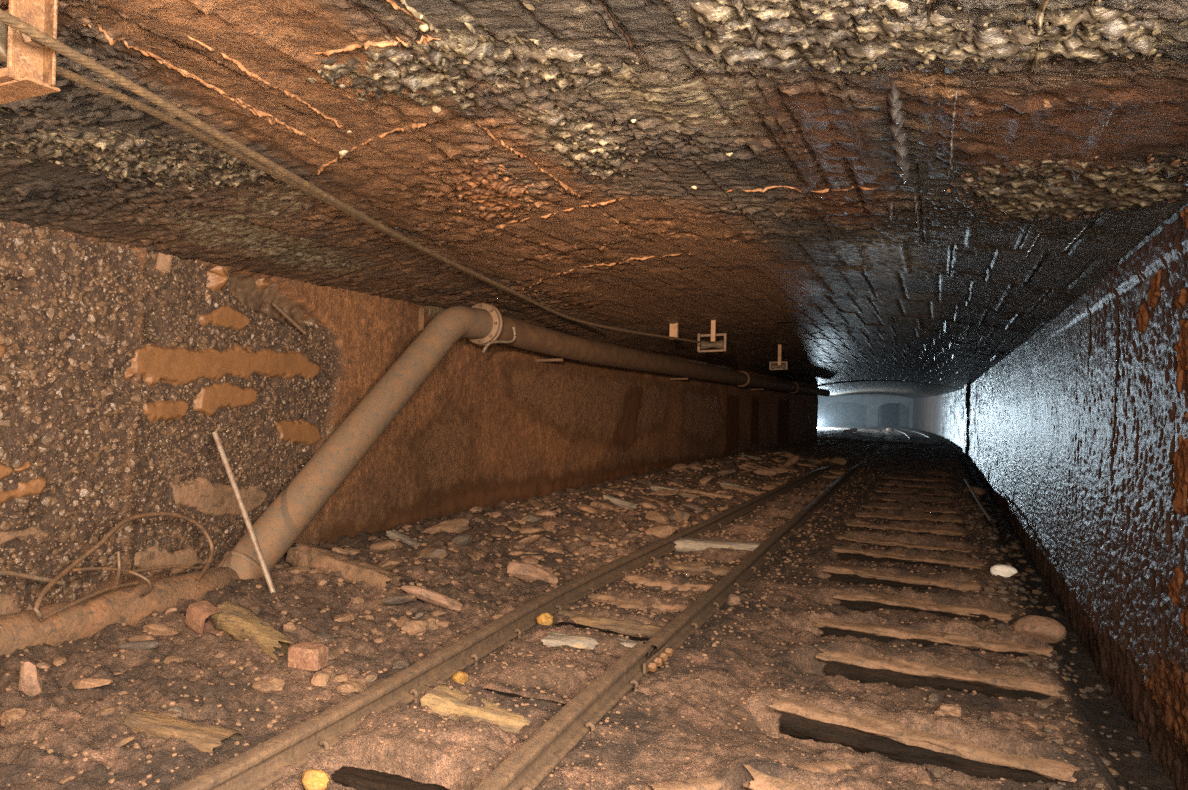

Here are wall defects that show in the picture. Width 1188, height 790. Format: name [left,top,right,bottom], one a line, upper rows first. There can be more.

spalling [676,0,1188,77]
spalling [305,22,639,180]
peeling [1171,435,1188,515]